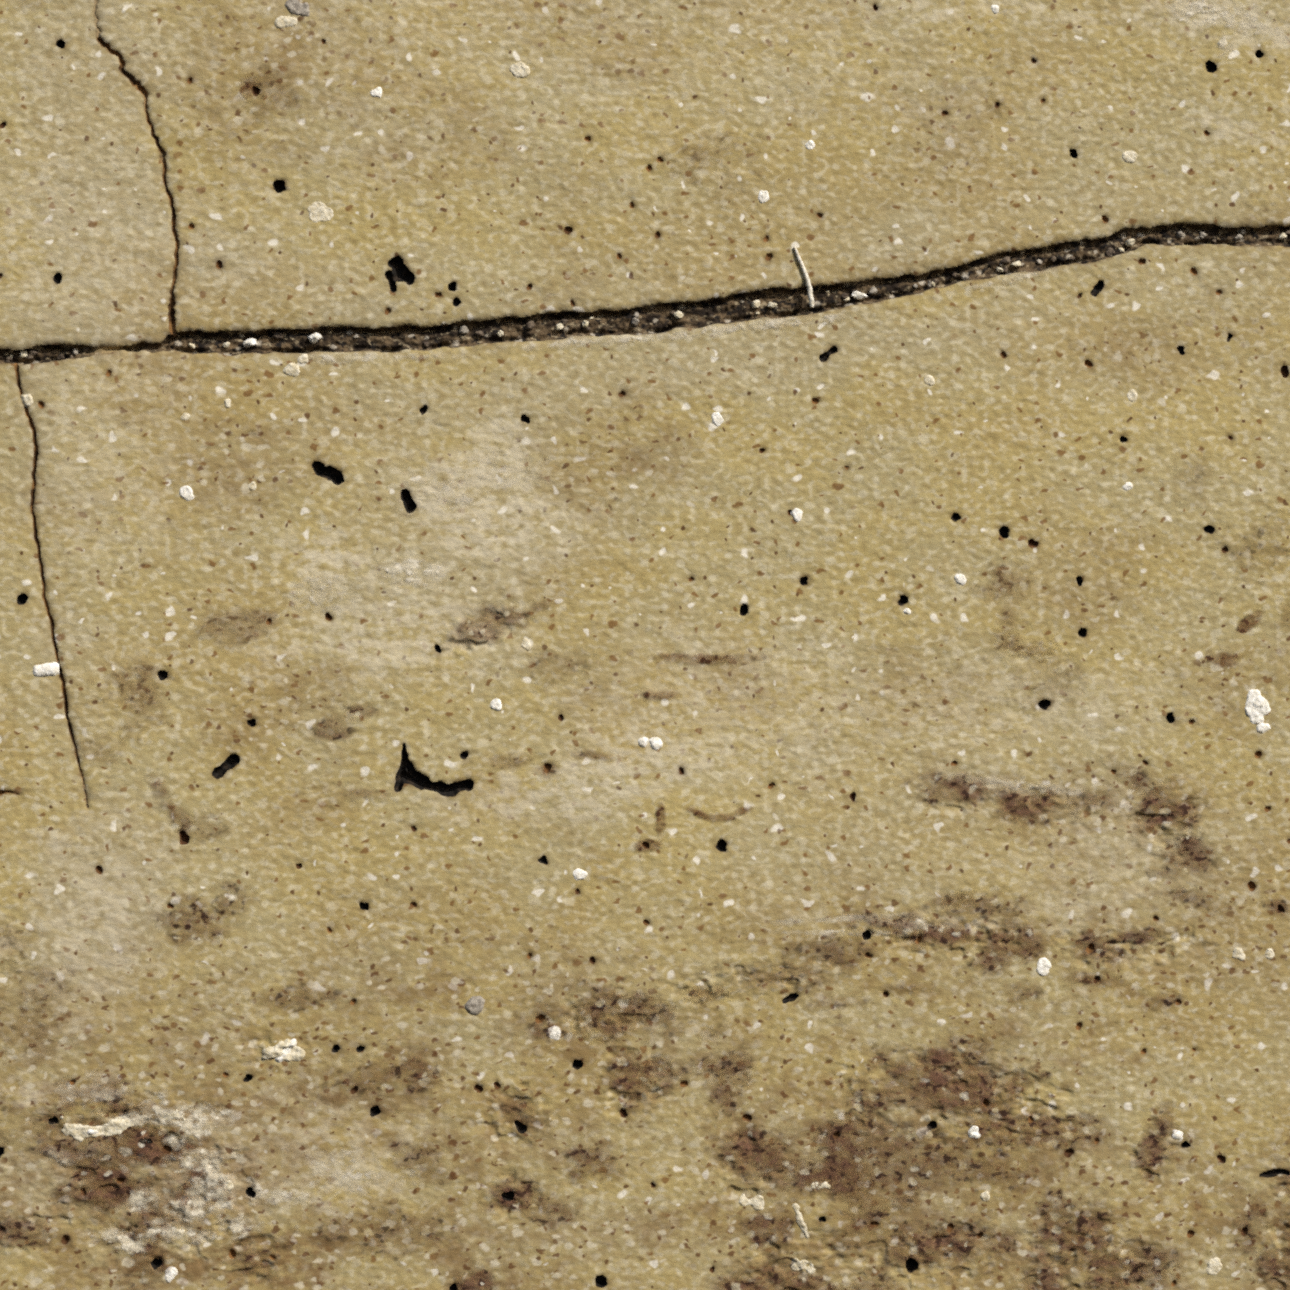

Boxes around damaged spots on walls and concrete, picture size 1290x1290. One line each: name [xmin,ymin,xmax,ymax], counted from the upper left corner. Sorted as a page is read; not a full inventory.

crack [0,0,1290,809]
damp [925,773,1052,823]
damp [1138,791,1212,873]
damp [795,899,1041,972]
damp [1077,927,1157,961]
damp [590,987,656,1029]
damp [608,1060,668,1107]
damp [718,1038,1099,1196]
damp [1137,1111,1169,1167]
damp [723,1215,833,1290]
damp [863,1211,1016,1290]
damp [1029,1189,1177,1290]